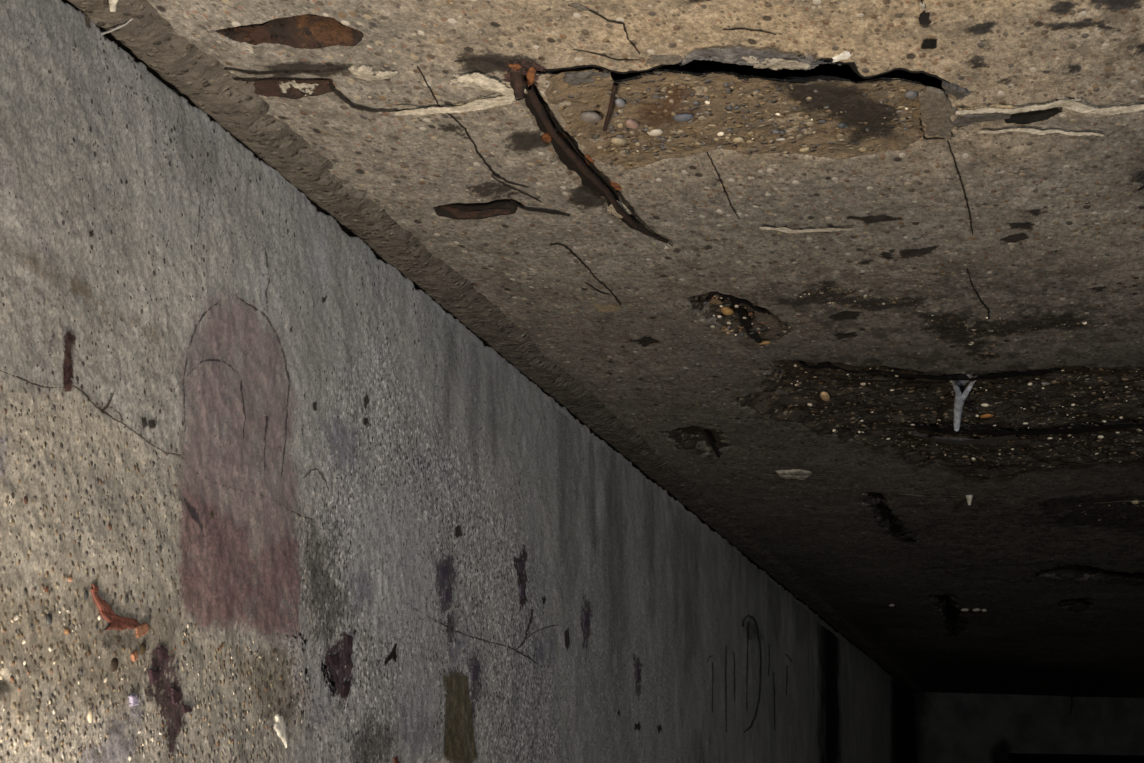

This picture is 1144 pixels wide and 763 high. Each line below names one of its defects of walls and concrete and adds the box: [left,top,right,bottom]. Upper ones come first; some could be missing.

spalling [216,14,364,49]
corrosion [503,60,545,87]
crack [224,63,541,202]
spalling [434,69,958,247]
crack [454,0,973,236]
spalling [1132,170,1144,191]
crack [966,268,990,320]
spalling [689,280,1144,481]
crack [0,370,313,520]
spalling [661,426,732,458]
spalling [863,492,919,543]